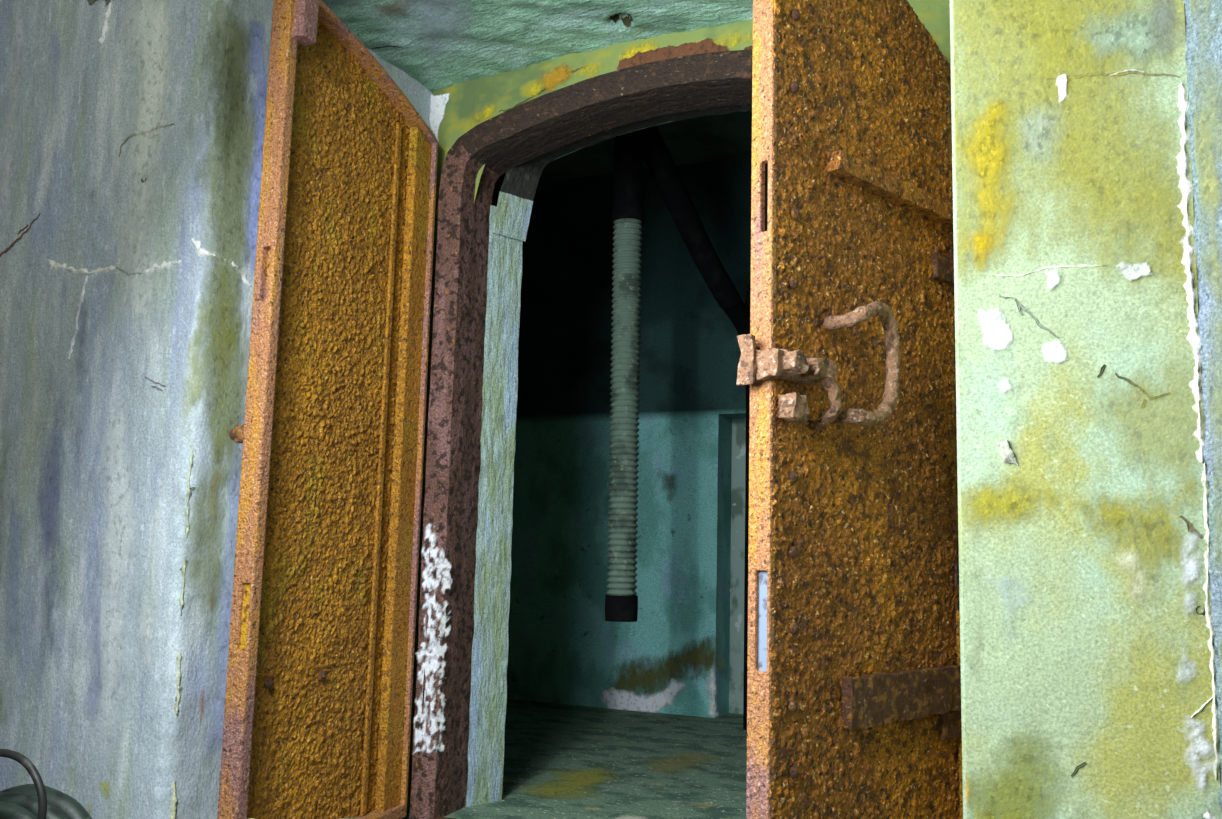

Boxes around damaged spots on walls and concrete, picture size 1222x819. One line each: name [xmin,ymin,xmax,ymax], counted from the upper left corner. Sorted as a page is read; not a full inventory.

corrosion [617,38,729,70]
crack [0,213,41,256]
peeling [992,263,1150,289]
crack [48,238,251,359]
peeling [978,308,1012,350]
peeling [1041,340,1066,363]
peeling [998,379,1012,392]
peeling [1176,83,1220,788]